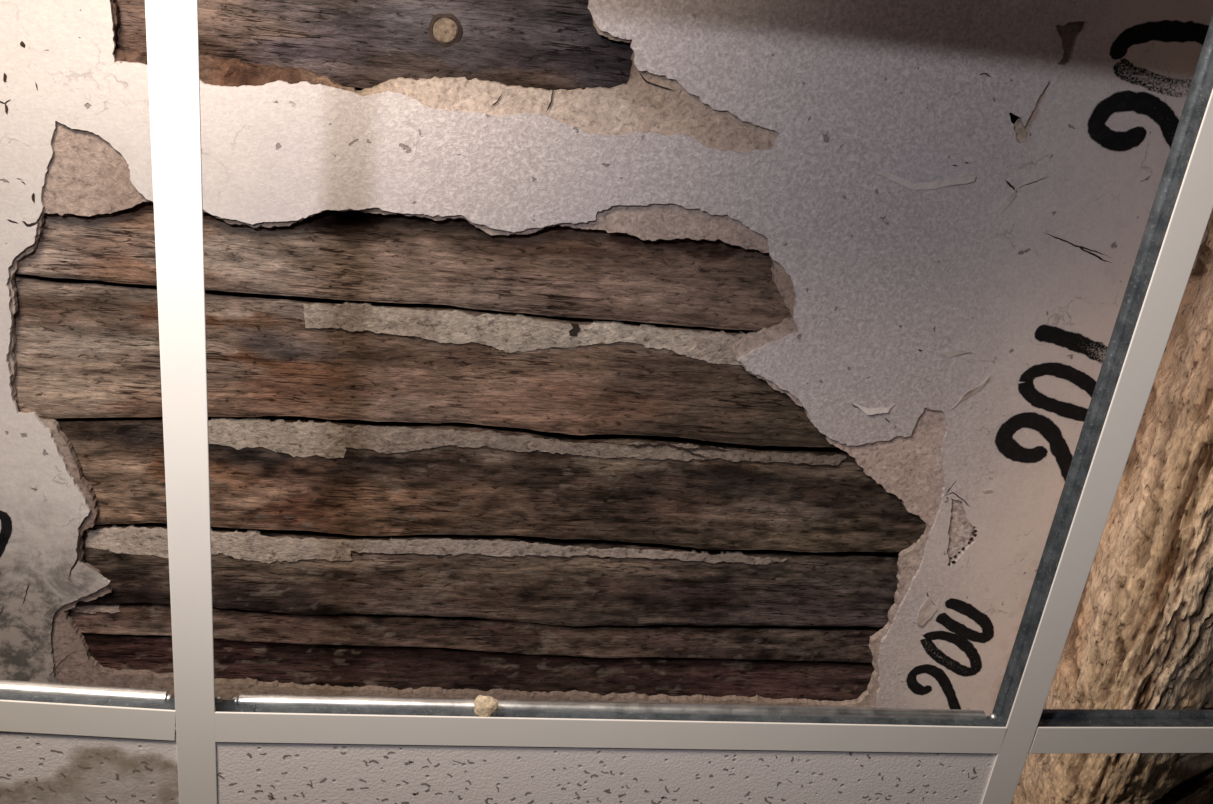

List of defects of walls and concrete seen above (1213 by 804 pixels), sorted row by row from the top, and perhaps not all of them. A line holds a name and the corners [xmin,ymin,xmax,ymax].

spalling [111,0,148,65]
spalling [199,20,779,152]
peeling [1014,83,1049,142]
peeling [1055,21,1085,65]
spalling [8,122,152,401]
spalling [203,203,811,422]
spalling [39,417,175,698]
spalling [208,375,991,708]
damp [0,750,179,803]